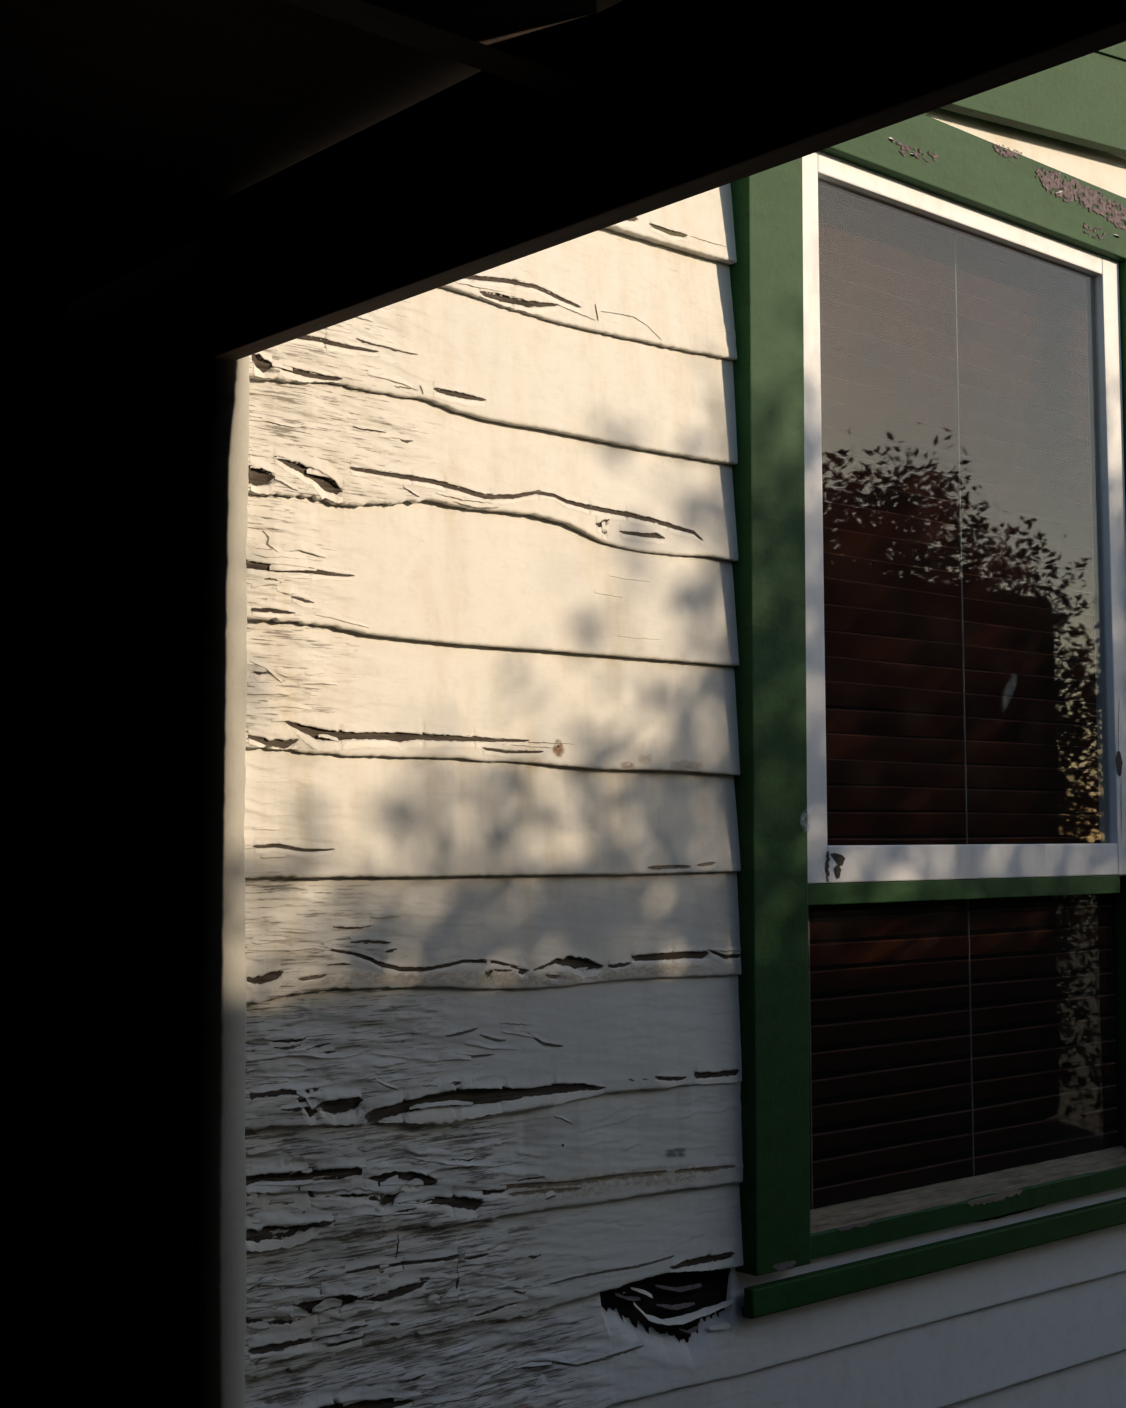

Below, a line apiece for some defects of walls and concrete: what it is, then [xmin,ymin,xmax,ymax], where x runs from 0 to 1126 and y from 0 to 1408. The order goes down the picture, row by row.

peeling [994,141,1022,161]
peeling [1036,166,1126,241]
crack [559,304,660,338]
crack [513,741,574,749]
peeling [247,908,708,993]
peeling [247,1032,604,1126]
peeling [629,1057,739,1087]
peeling [245,1134,736,1231]
peeling [246,1246,488,1368]
peeling [474,1286,528,1321]
hole [600,1241,736,1343]
peeling [259,1366,439,1408]